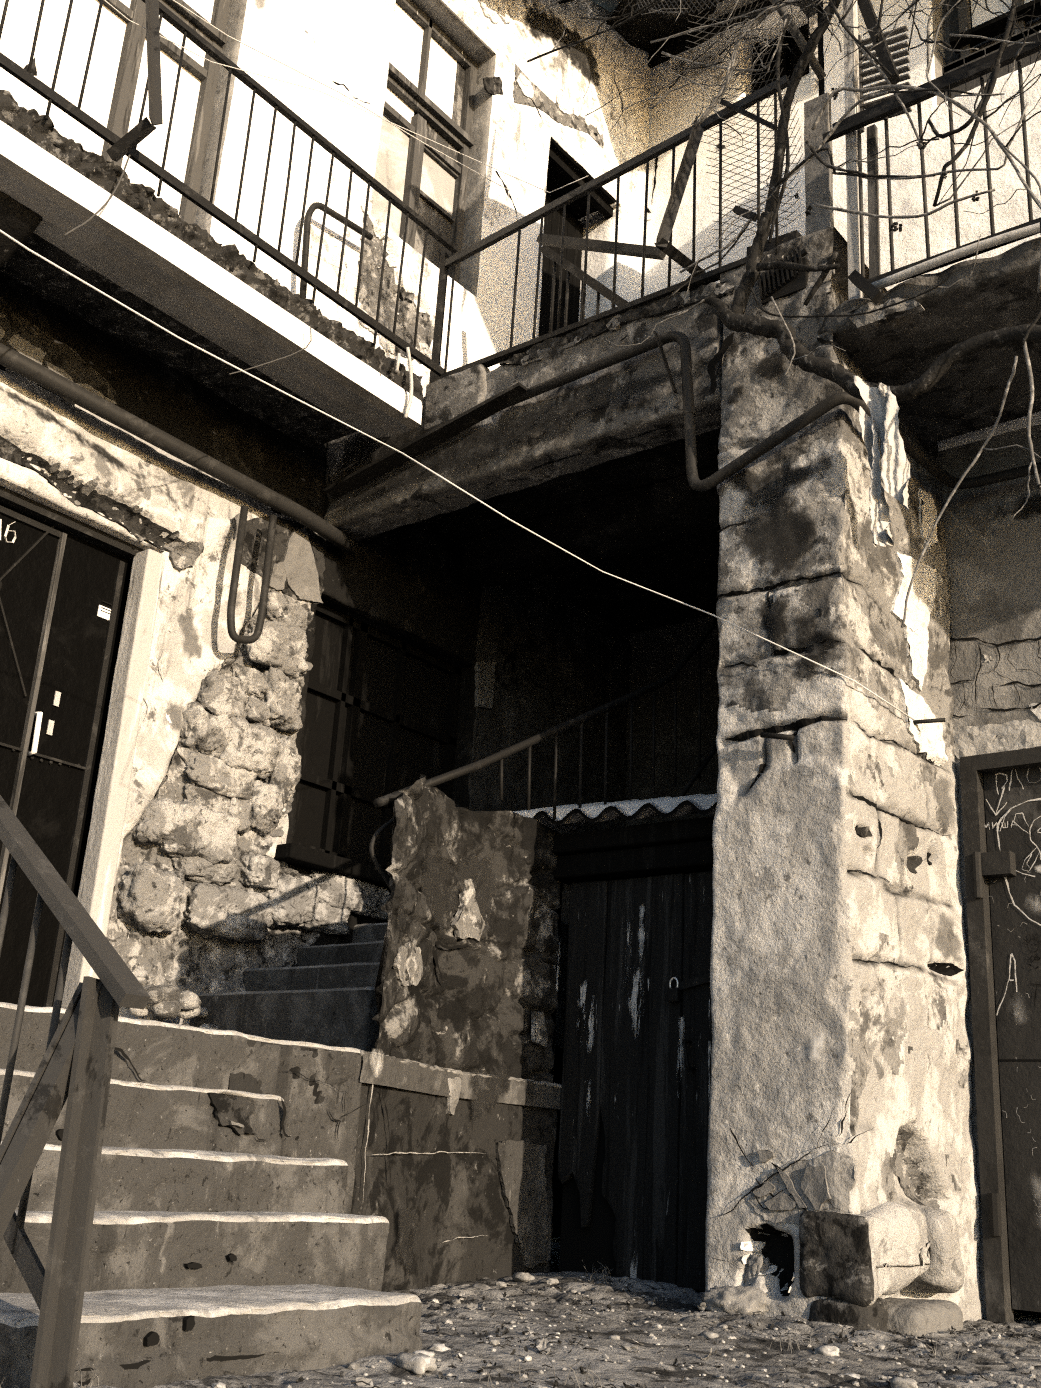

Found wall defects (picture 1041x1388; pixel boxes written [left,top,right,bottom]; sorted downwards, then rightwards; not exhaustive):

flaking render [483,64,604,148]
spalling [0,436,204,571]
damp [729,456,831,575]
damp [760,597,837,678]
crack [950,636,1041,739]
spalling [207,1092,257,1135]
crack [717,1084,872,1218]
spalling [740,1223,795,1296]